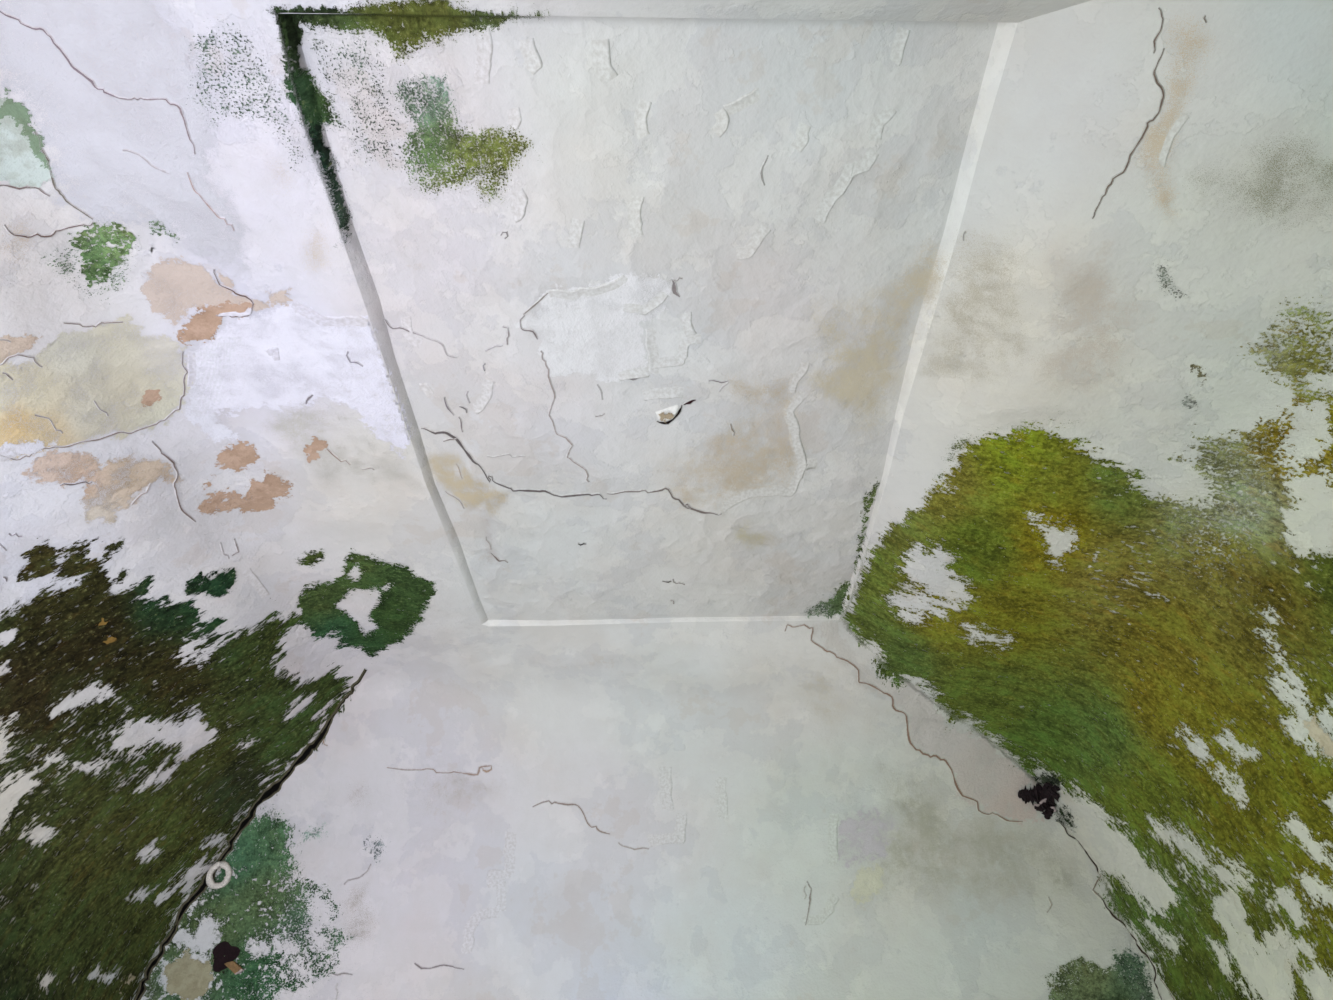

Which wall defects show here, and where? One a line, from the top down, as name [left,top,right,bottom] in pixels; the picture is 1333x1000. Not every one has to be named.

peeling [0,87,55,188]
crack [0,9,235,239]
crack [1091,7,1165,219]
peeling [0,255,369,524]
crack [384,292,722,516]
damp [654,212,1155,550]
crack [485,537,509,563]
crack [133,668,367,1000]
crack [344,864,372,885]
crack [387,764,493,776]
crack [532,800,649,851]
damp [860,753,1093,915]